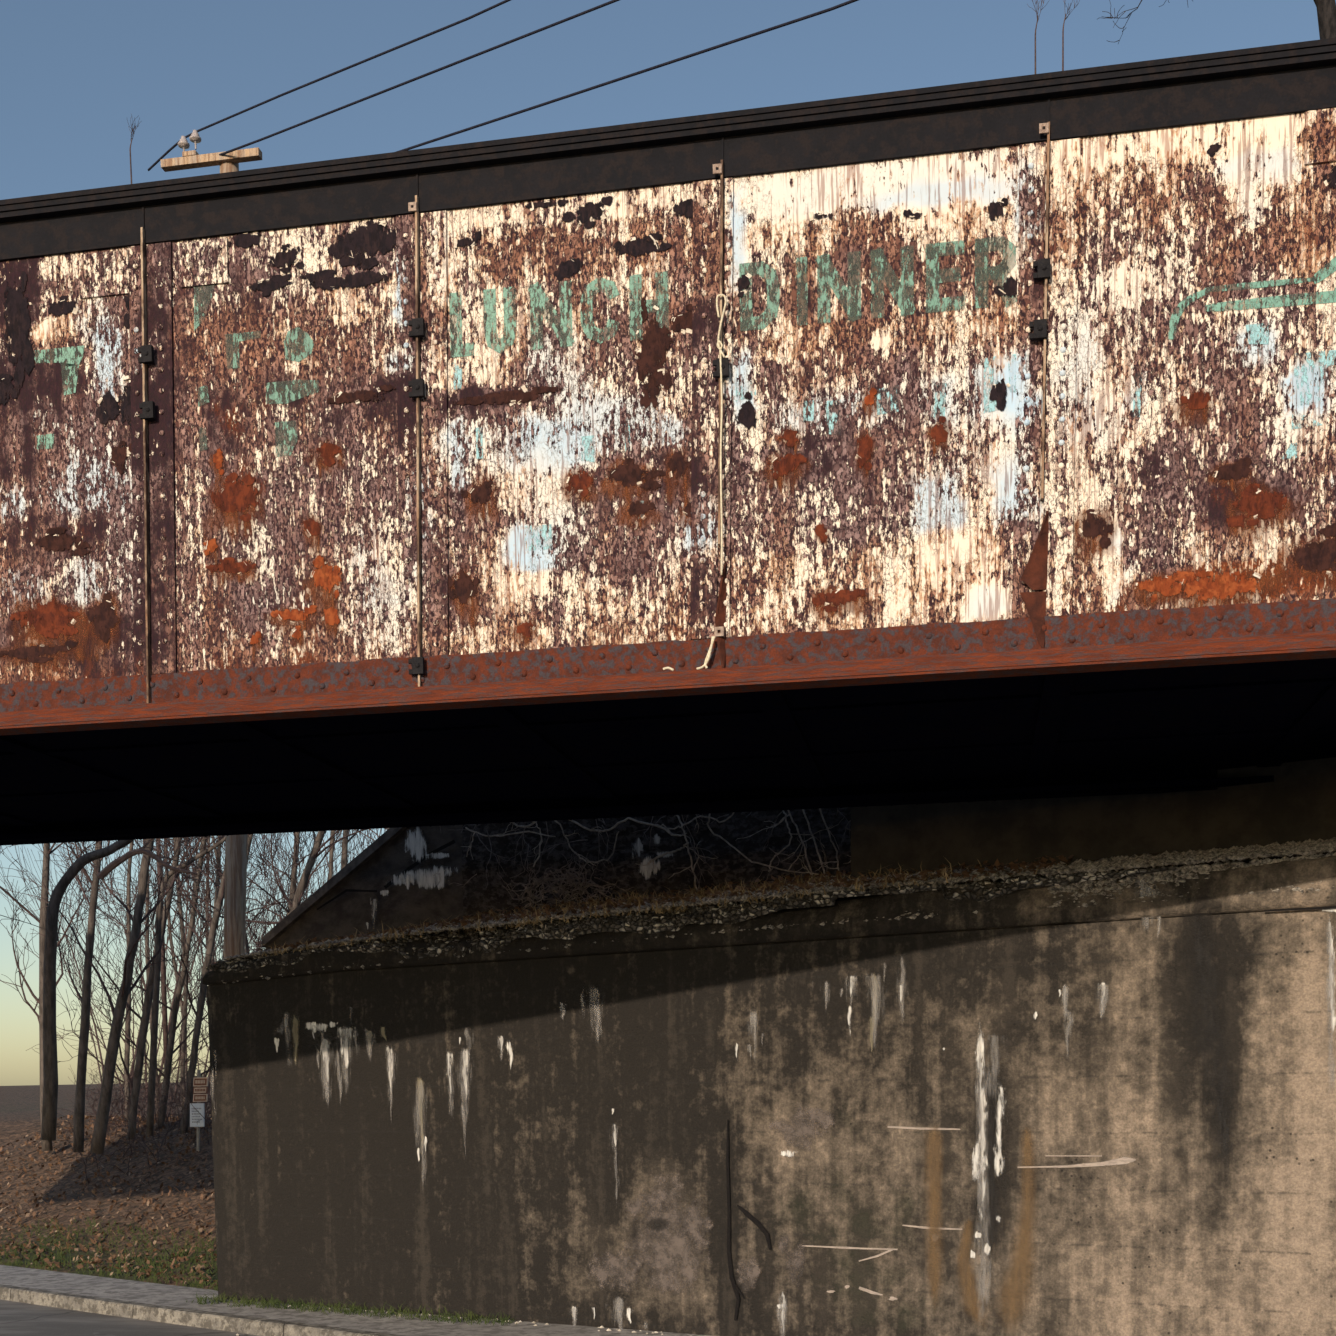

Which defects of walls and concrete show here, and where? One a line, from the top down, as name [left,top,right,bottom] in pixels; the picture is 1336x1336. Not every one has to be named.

peeling [525,196,613,229]
peeling [242,219,397,296]
peeling [735,392,761,429]
peeling [989,378,1010,411]
corrosion [563,451,692,528]
corrosion [1209,457,1290,538]
corrosion [271,517,342,649]
corrosion [0,592,118,675]
water stain [366,827,457,929]
water stain [274,1016,393,1087]
water stain [447,1037,468,1094]
water stain [970,1035,1006,1258]